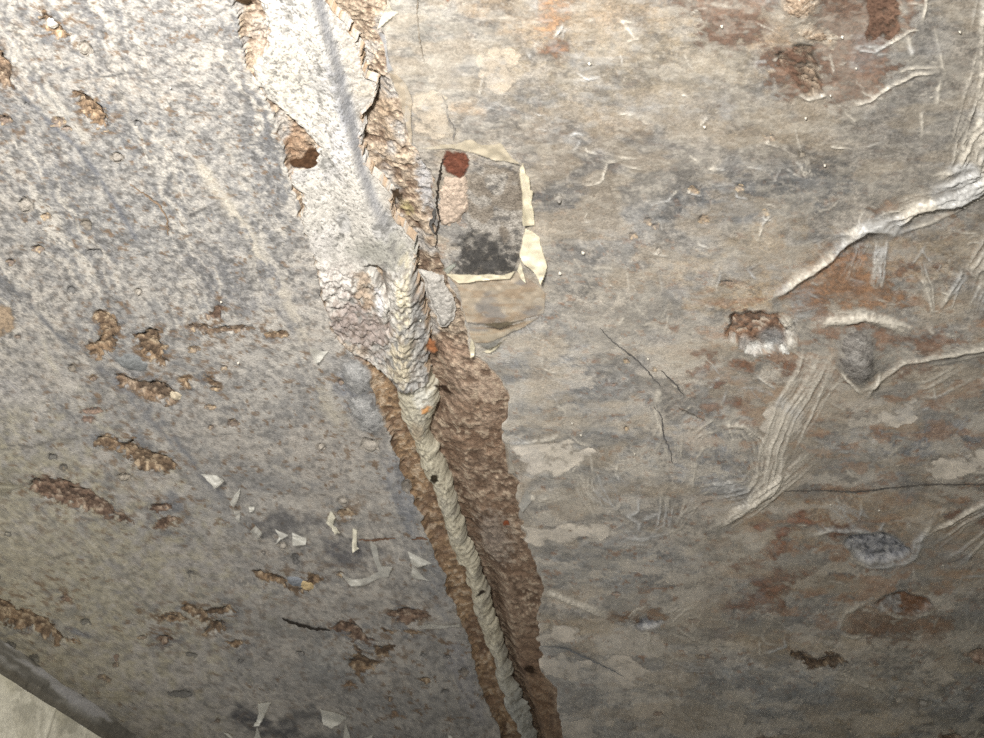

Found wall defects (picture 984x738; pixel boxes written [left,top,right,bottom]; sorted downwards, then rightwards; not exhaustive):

spalling [0,50,15,89]
spalling [233,0,268,77]
corrosion [672,0,925,111]
spalling [260,87,319,217]
spalling [329,0,564,738]
spalling [30,453,134,524]
spalling [93,433,177,475]
spalling [0,598,81,647]
spalling [158,601,243,663]